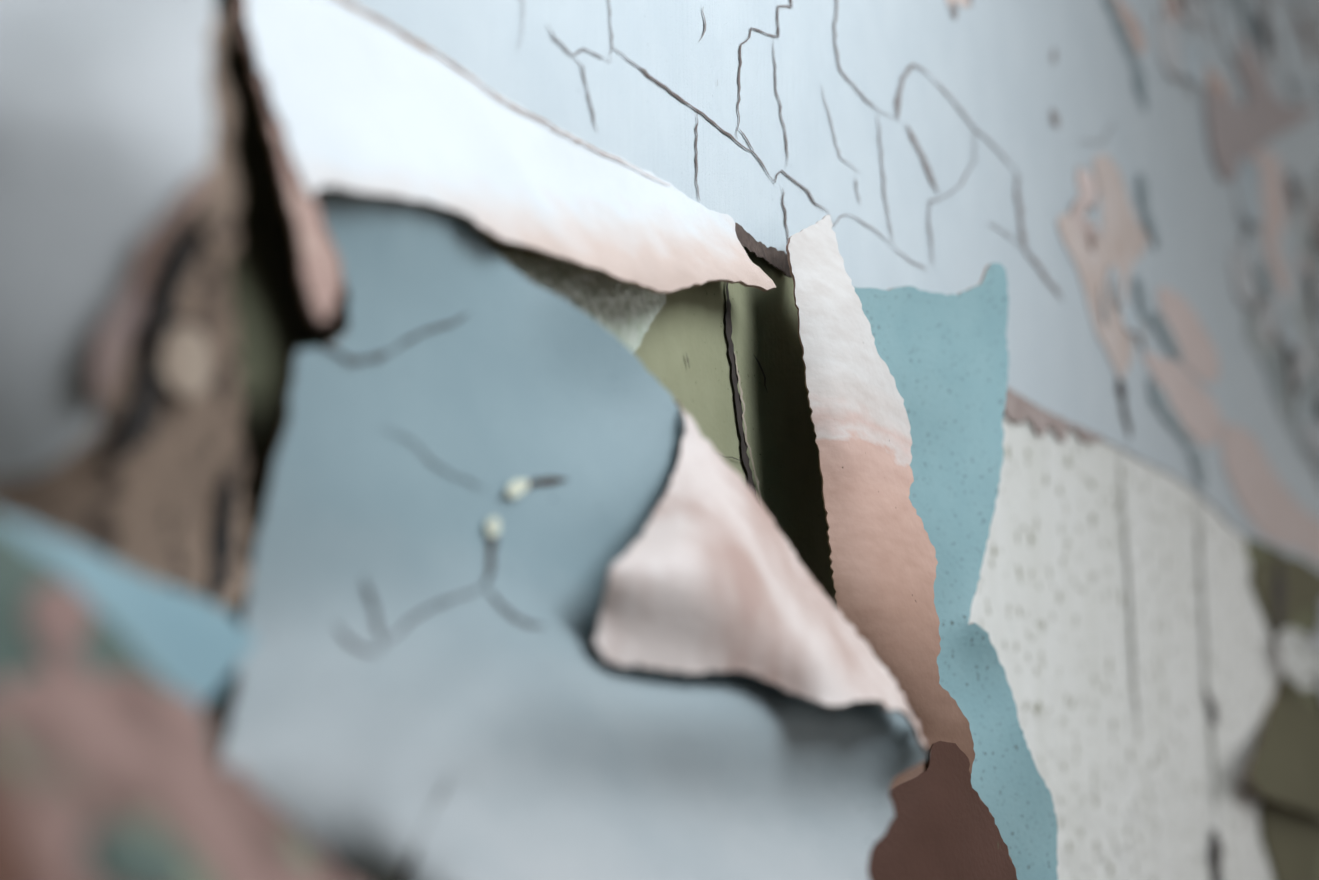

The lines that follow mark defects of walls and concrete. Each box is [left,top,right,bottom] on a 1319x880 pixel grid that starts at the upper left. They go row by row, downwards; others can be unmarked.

crack [322,314,470,365]
crack [334,428,568,654]
peeling [0,0,928,880]
crack [341,0,1063,299]
peeling [735,215,1058,880]
spalling [1104,0,1147,110]
peeling [1057,122,1225,446]
peeling [1230,150,1319,474]
peeling [1247,554,1319,880]